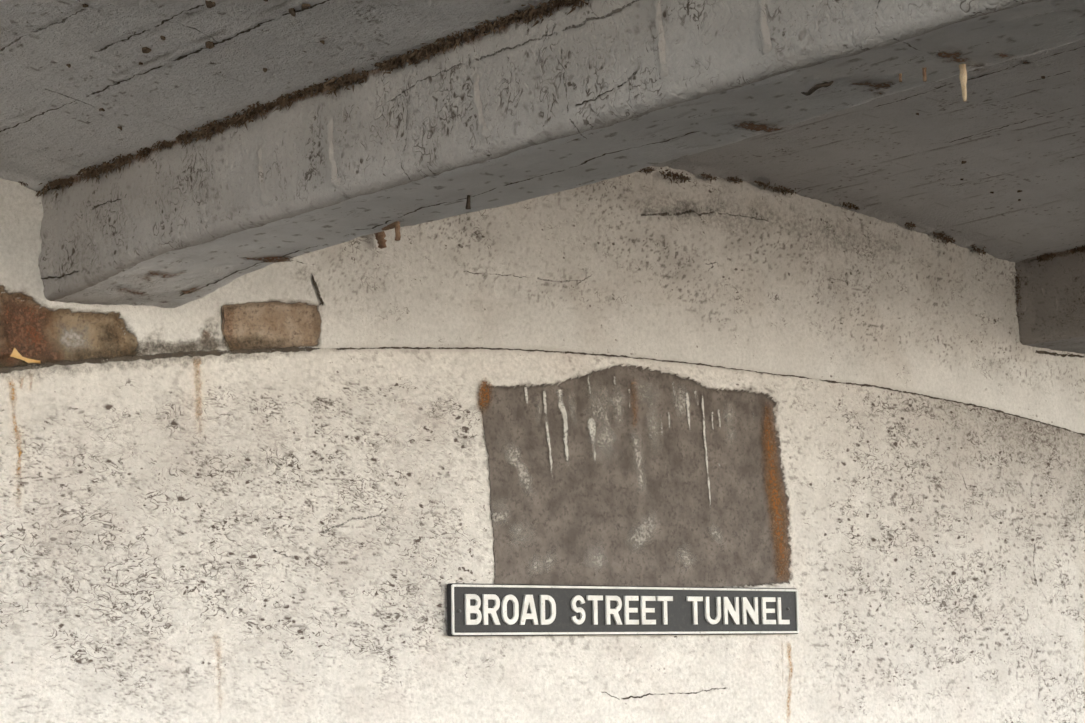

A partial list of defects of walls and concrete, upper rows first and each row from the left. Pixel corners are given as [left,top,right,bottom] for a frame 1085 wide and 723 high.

spalling [0,285,138,368]
spalling [222,301,321,351]
water stain [543,389,569,469]
water stain [588,418,596,459]
water stain [672,384,721,504]
corrosion [762,408,787,578]
crack [602,687,726,700]